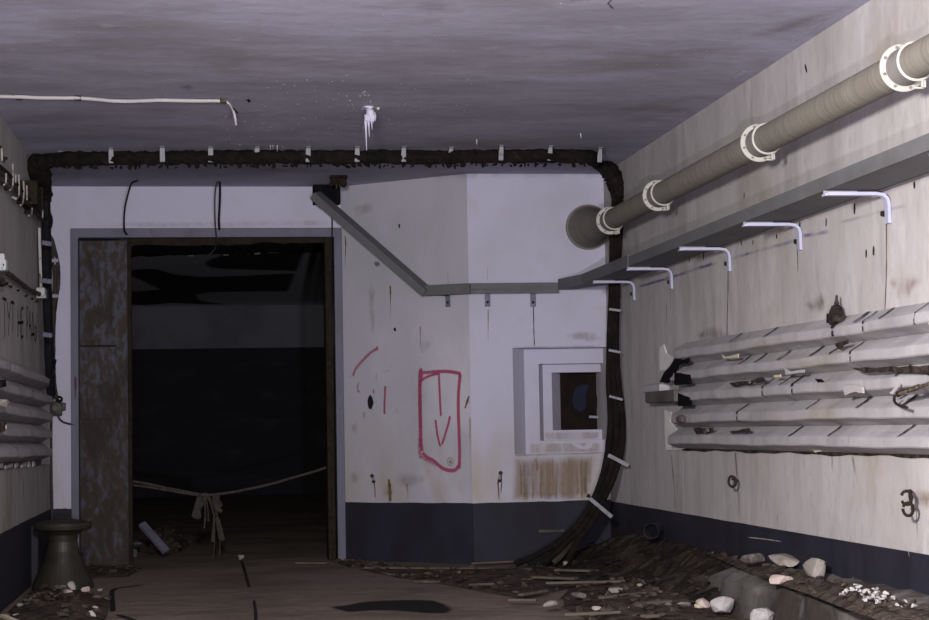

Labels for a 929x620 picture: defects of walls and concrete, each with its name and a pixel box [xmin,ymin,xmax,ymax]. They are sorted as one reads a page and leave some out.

corrosion [517,461,589,496]